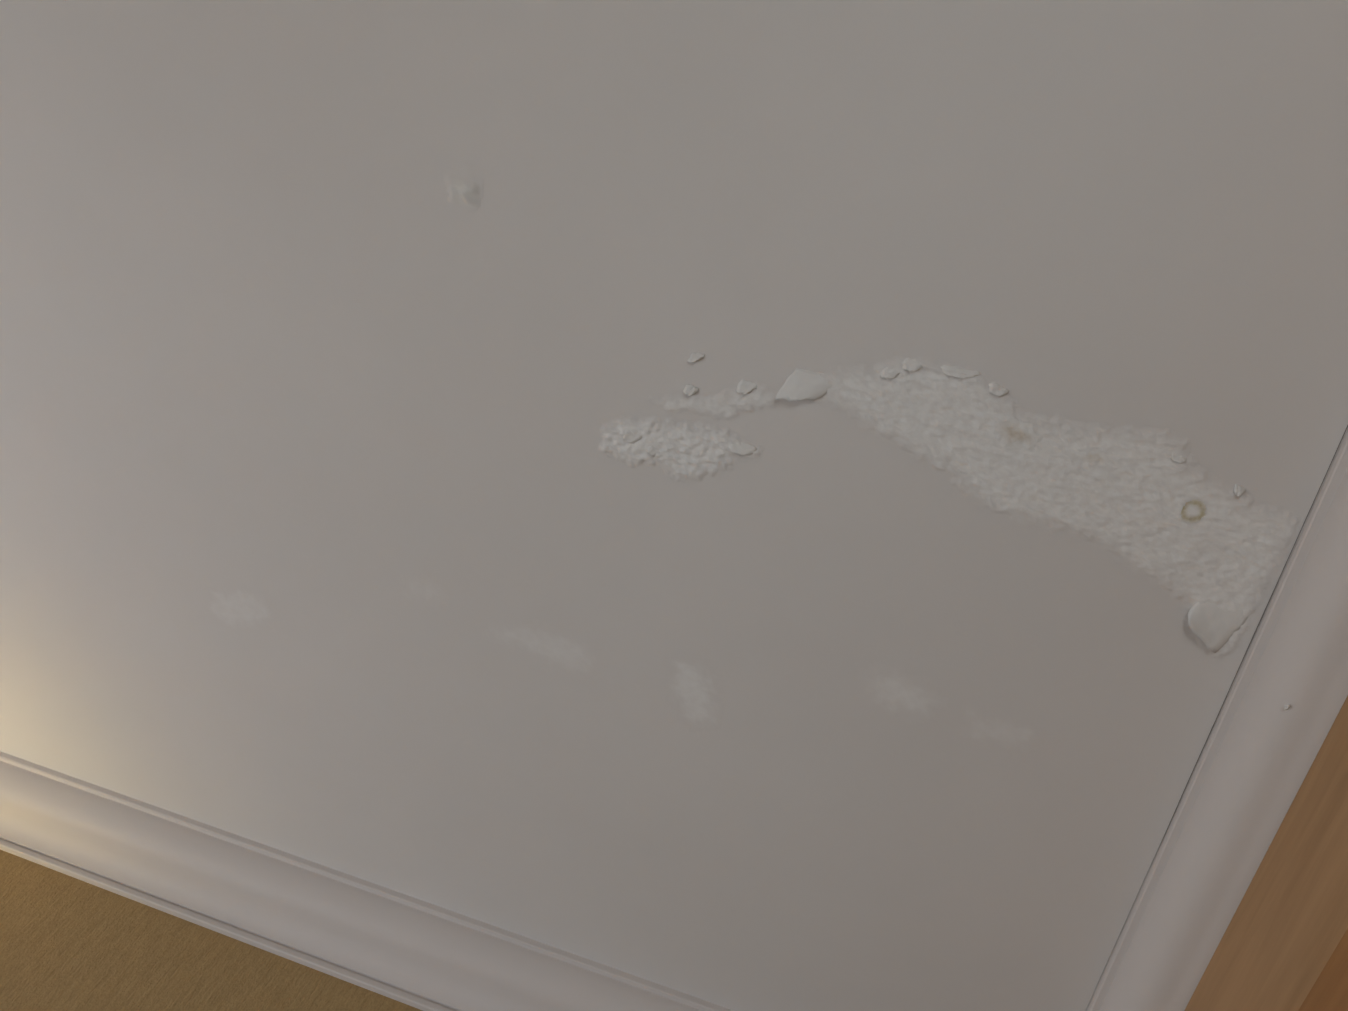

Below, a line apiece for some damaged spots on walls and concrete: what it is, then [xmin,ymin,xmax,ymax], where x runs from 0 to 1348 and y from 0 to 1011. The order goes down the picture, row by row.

peeling [593,352,1306,664]